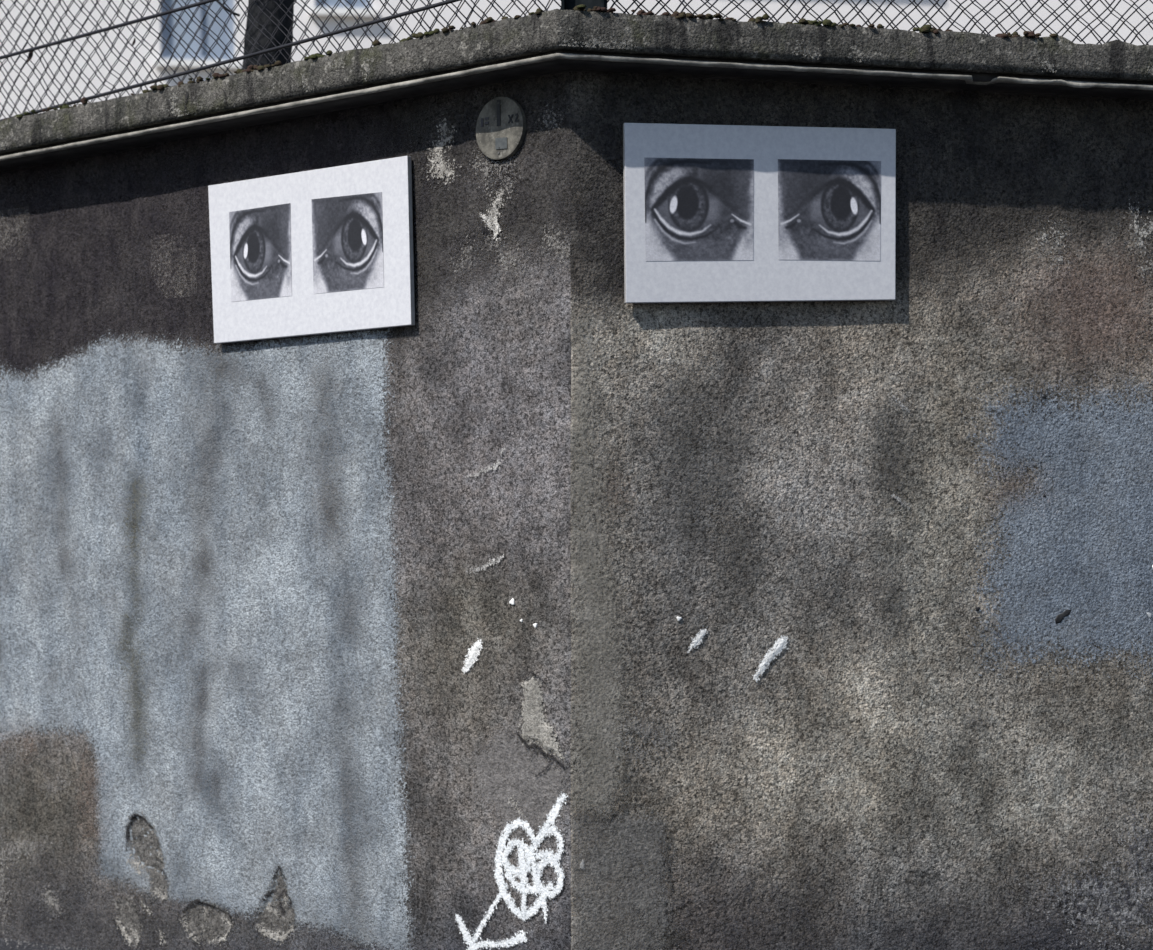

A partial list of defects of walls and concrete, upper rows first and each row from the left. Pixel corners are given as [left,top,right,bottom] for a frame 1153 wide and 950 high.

water stain [0,69,1153,393]
flaking render [467,671,570,842]
flaking render [109,810,170,949]
flaking render [180,898,234,947]
flaking render [255,865,299,945]